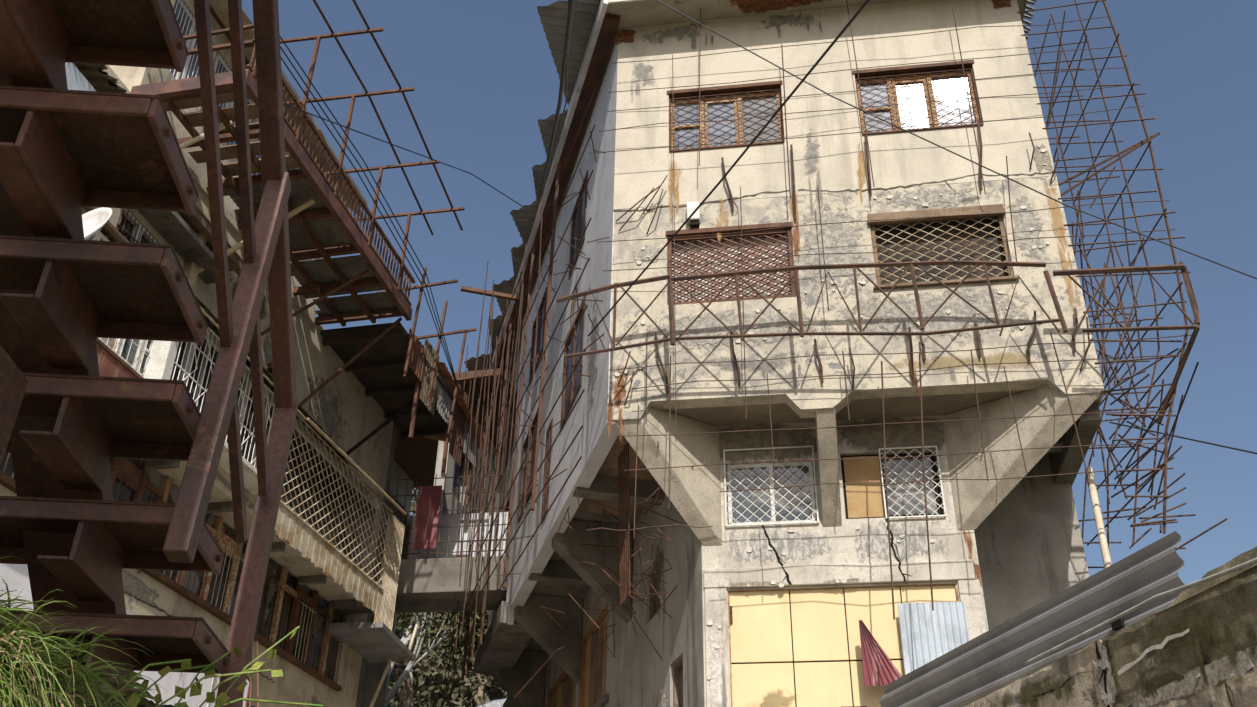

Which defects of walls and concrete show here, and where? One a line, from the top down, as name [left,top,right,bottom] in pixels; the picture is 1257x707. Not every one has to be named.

peeling [874,188,974,207]
peeling [1007,195,1049,259]
rust [96,343,137,378]
crack [762,525,792,585]
crack [886,519,911,582]
crack [124,591,173,616]